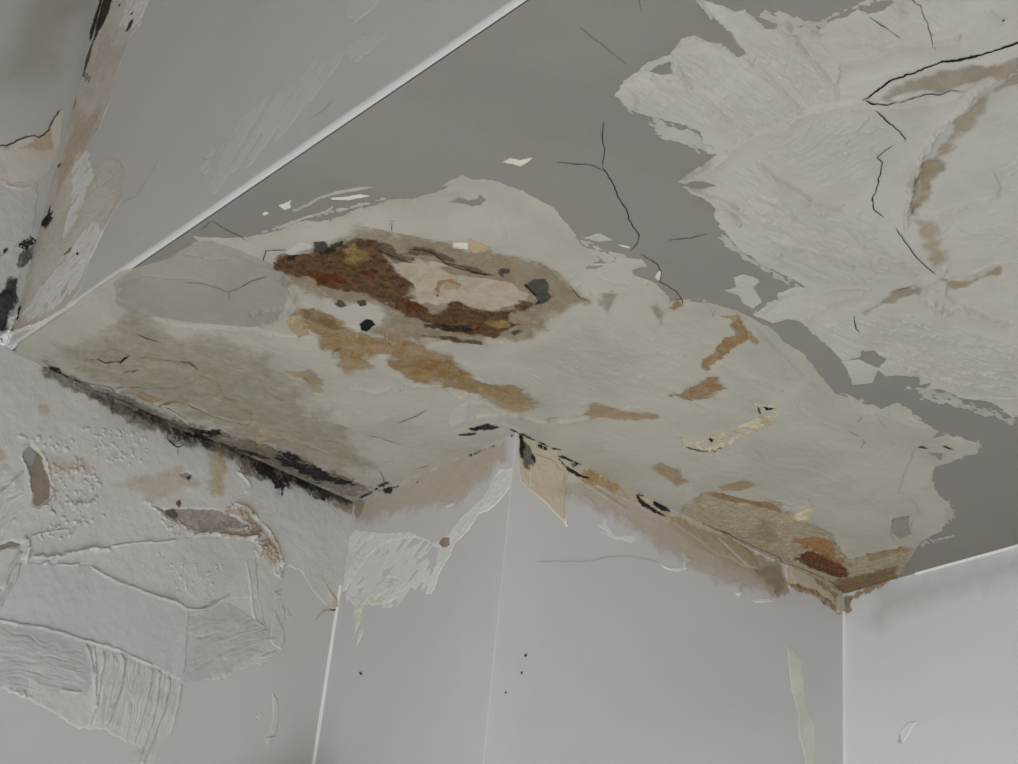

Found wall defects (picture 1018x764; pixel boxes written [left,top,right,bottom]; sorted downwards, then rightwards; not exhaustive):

crack [0,109,61,146]
peeling [0,0,149,346]
peeling [359,320,375,332]
water stain [273,231,586,412]
peeling [525,279,552,305]
crack [556,124,684,307]
crack [862,0,1018,290]
peeling [23,447,50,506]
water stain [44,367,501,517]
peeling [312,434,744,647]
water stain [585,405,658,420]
water stain [459,424,788,596]